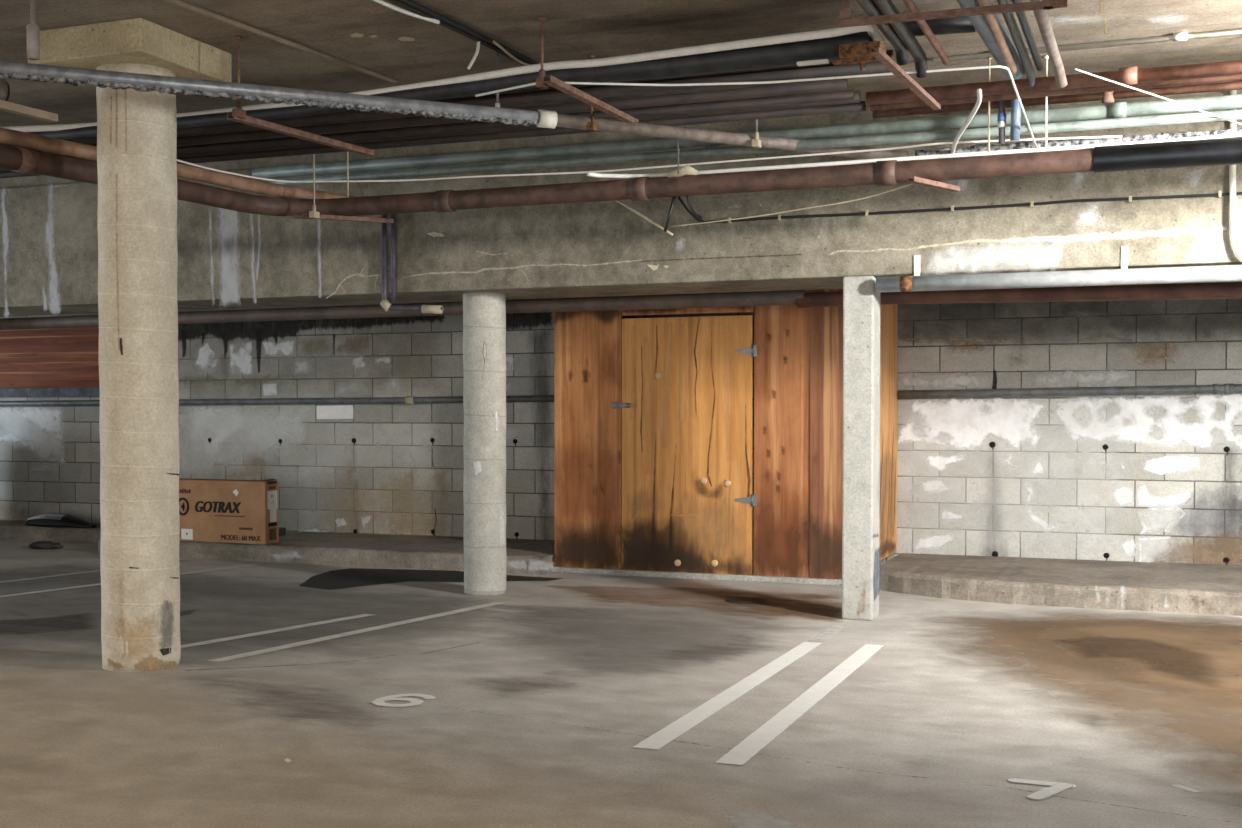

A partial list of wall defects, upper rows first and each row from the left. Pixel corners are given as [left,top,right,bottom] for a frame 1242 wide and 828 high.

damp [44,185,68,313]
damp [209,208,260,304]
damp [879,370,1242,562]
damp [300,568,464,590]
damp [506,505,712,581]
damp [580,588,842,620]
damp [758,503,842,576]
damp [956,615,1242,779]